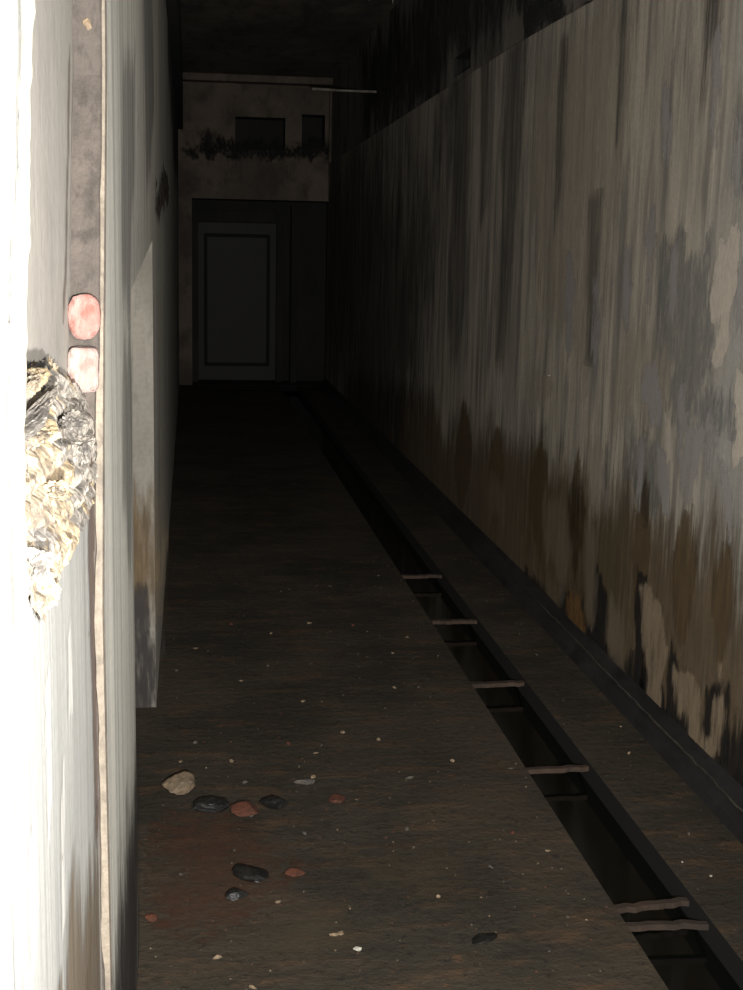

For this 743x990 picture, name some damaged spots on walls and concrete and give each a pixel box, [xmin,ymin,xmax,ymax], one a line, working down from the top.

peeling [709,220,741,368]
peeling [732,361,743,470]
leakage [347,372,743,787]